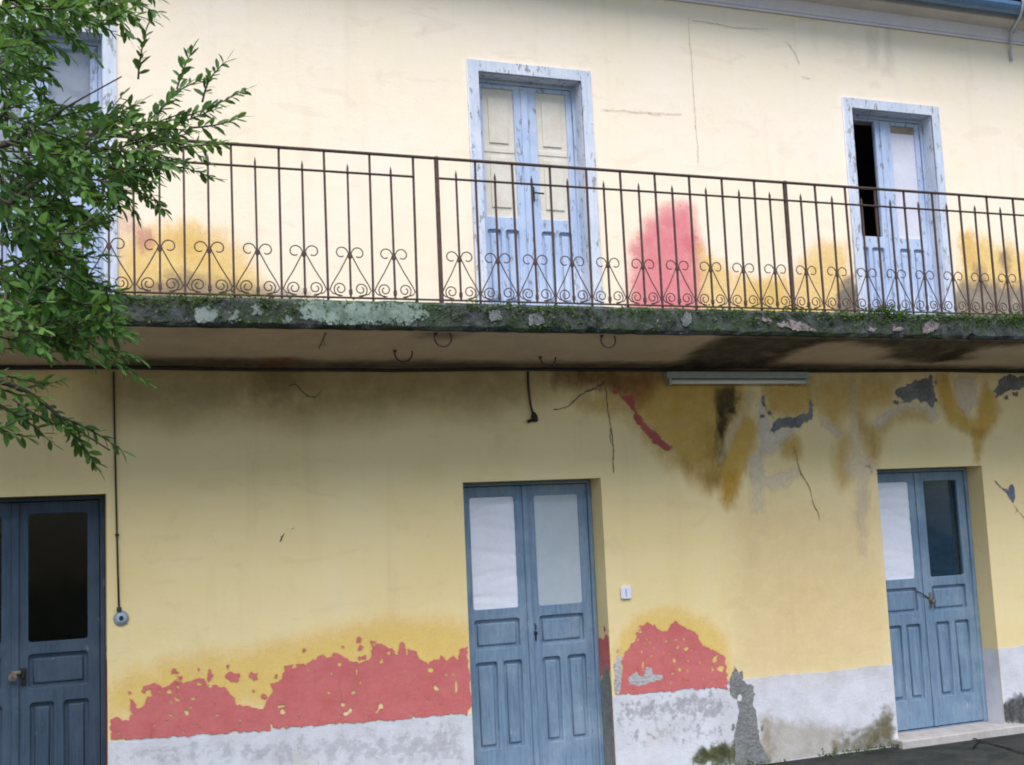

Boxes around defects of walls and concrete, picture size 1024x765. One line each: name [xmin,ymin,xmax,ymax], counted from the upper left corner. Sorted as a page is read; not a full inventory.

crack [688,18,764,158]
crack [553,382,614,473]
peeling [612,390,673,451]
water stain [416,337,1024,521]
flaking render [760,395,813,434]
flaking render [893,374,938,408]
flaking render [994,374,1024,400]
flaking render [995,481,1015,503]
peeling [105,636,472,765]
peeling [599,621,768,765]